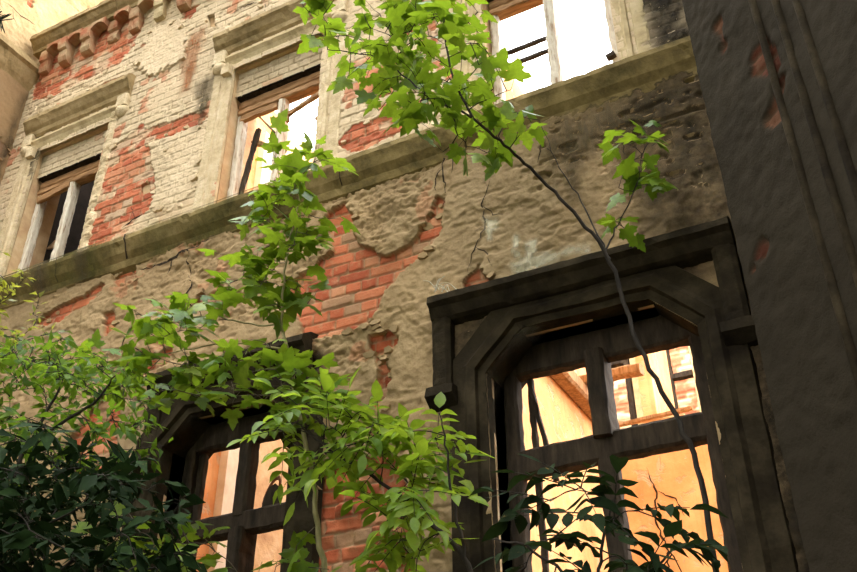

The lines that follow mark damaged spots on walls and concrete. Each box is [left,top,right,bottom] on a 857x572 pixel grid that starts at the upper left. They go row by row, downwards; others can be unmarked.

flaking render [79,112,207,249]
crack [467,181,497,272]
flaking render [35,271,139,329]
flaking render [290,196,445,412]